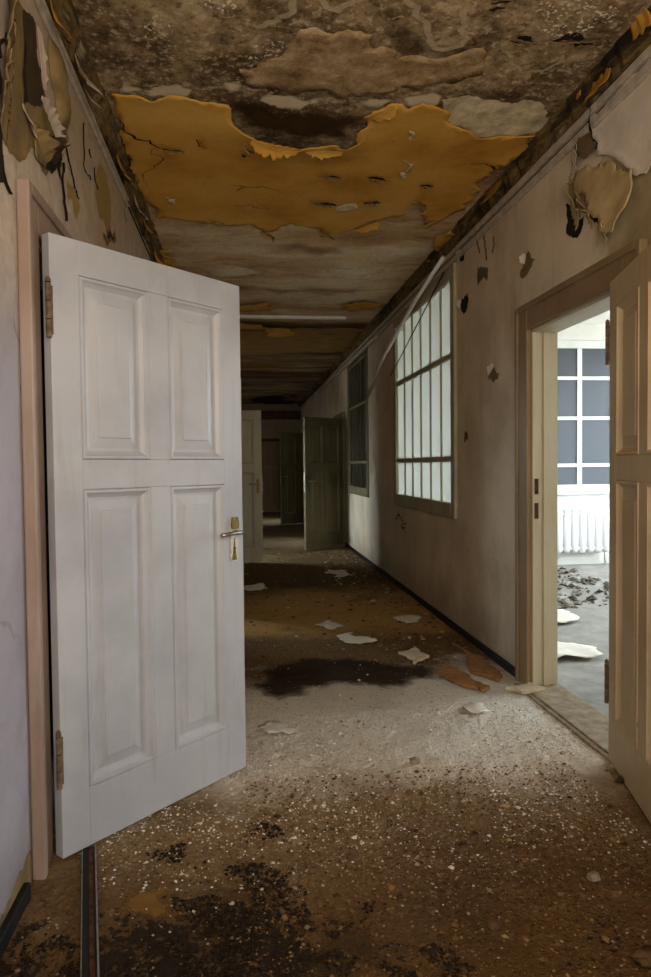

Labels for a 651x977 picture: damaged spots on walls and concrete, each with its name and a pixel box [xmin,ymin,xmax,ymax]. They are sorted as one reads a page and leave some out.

damp [255,0,297,28]
damp [319,0,356,13]
damp [393,0,470,55]
damp [535,0,618,37]
peeling [0,0,70,179]
damp [120,80,191,97]
damp [203,81,441,110]
peeling [575,58,651,176]
peeling [112,27,549,263]
flaking render [103,229,116,247]
flaking render [518,251,535,279]